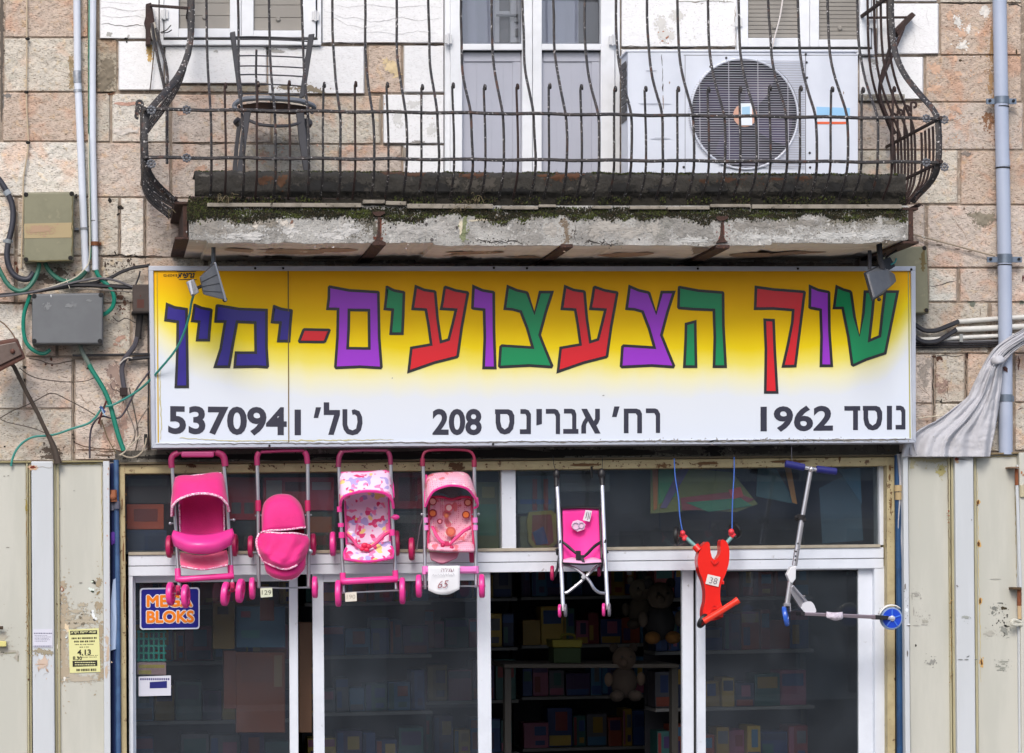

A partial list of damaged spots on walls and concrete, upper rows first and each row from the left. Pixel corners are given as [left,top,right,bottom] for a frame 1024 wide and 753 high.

peeling [643,5,732,44]